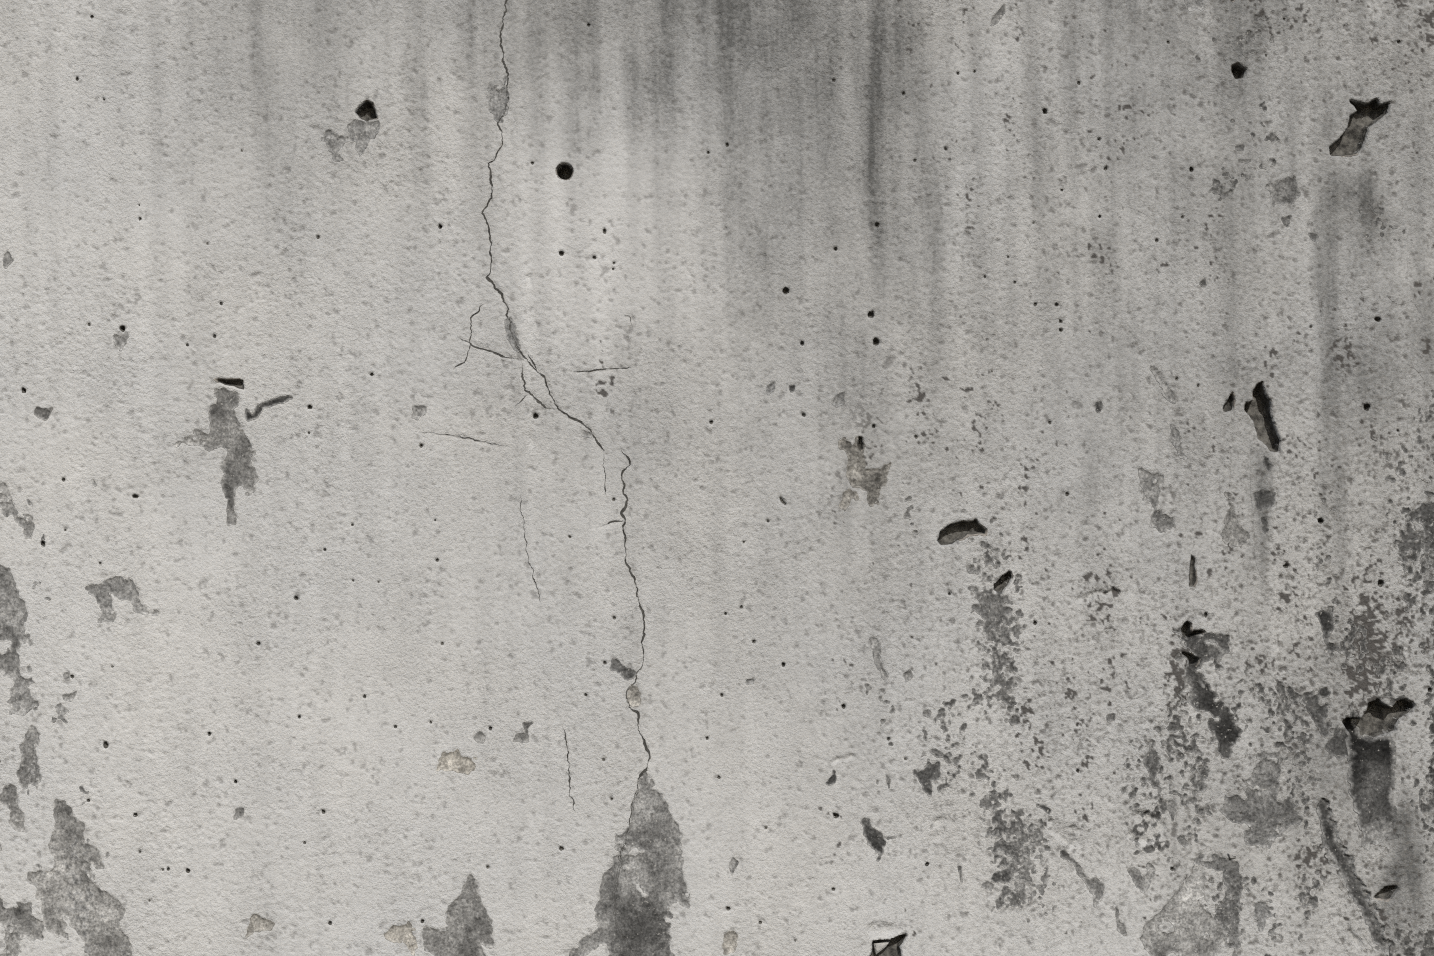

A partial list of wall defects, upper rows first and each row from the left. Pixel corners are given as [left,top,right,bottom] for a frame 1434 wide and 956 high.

damp [122,0,981,420]
damp [1019,0,1434,510]
peeling [85,576,159,623]
peeling [175,387,293,526]
crack [455,0,651,952]
damp [1251,440,1280,581]
peeling [0,565,77,832]
peeling [913,519,1434,956]
peeling [0,786,132,956]
peeling [384,874,494,956]
peeling [569,772,690,956]
spalling [866,917,905,954]